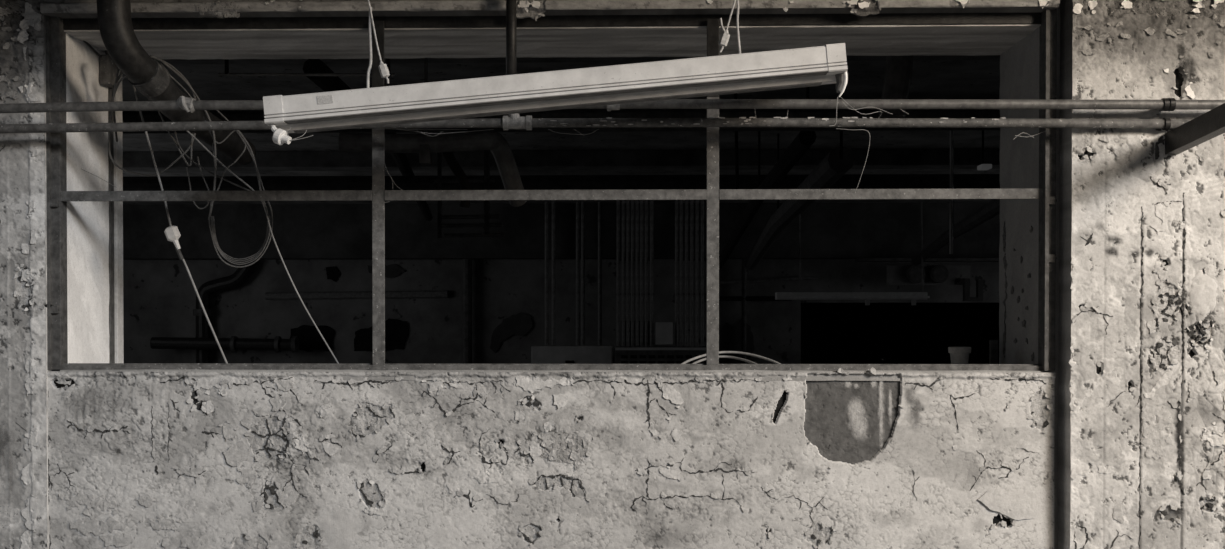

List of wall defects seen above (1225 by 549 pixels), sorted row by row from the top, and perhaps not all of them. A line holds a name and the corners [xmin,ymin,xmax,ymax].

peeling [0,75,39,103]
peeling [0,2,42,60]
flaking render [1163,55,1195,99]
crack [18,376,530,549]
crack [574,376,828,521]
flaking render [772,367,905,469]
crack [905,374,1046,491]
crack [1072,176,1225,549]